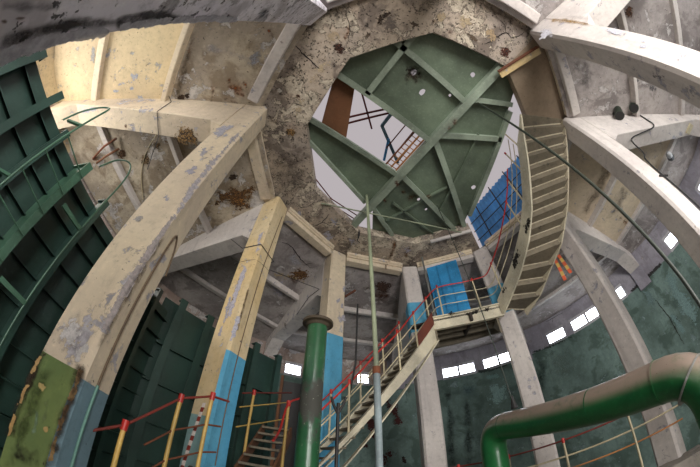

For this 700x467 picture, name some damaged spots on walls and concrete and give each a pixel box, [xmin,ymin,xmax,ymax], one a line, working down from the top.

damp [4,12,176,45]
peeling [101,125,241,329]
spalling [215,174,256,211]
peeling [218,265,247,341]
rust [365,281,391,301]
peeling [8,356,46,436]
peeling [43,317,89,467]